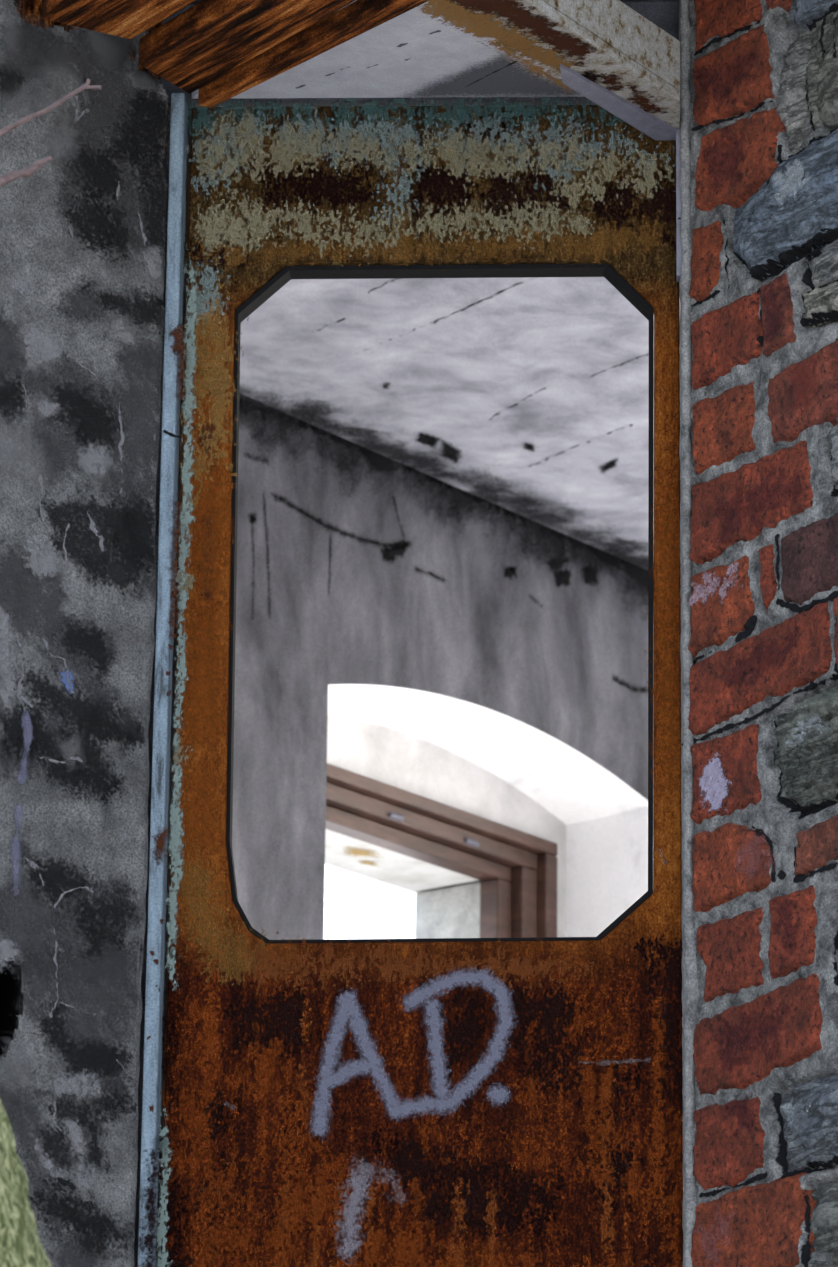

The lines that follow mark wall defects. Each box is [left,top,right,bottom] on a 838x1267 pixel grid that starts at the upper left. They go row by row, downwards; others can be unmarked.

rust [168,501,183,638]
rust [170,325,188,400]
peeling [150,85,676,991]
rust [137,828,684,1267]